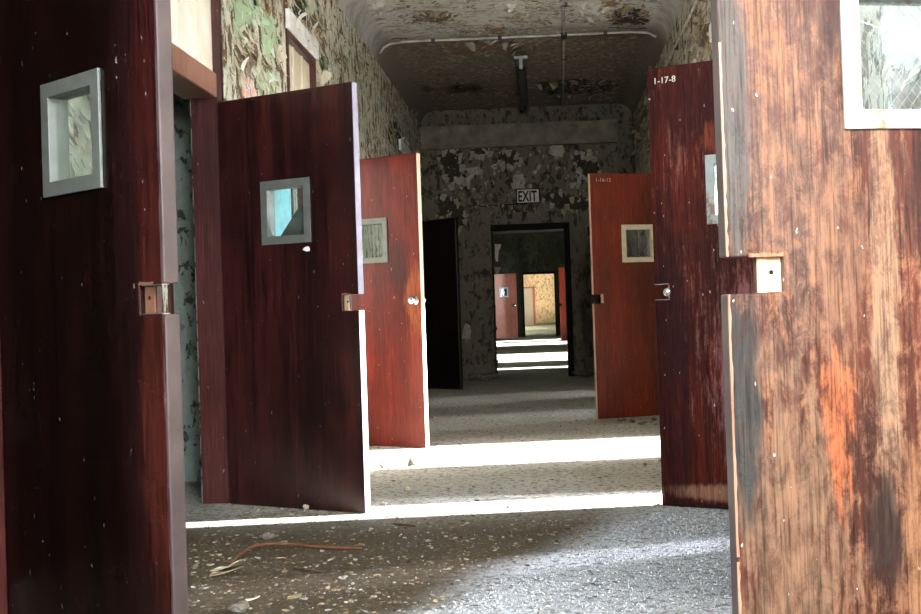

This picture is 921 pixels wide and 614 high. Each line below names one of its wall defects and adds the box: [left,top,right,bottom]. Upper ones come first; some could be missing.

peeling [222,0,425,183]
peeling [372,0,657,109]
peeling [631,0,712,174]
peeling [435,145,602,237]
peeling [637,230,648,257]